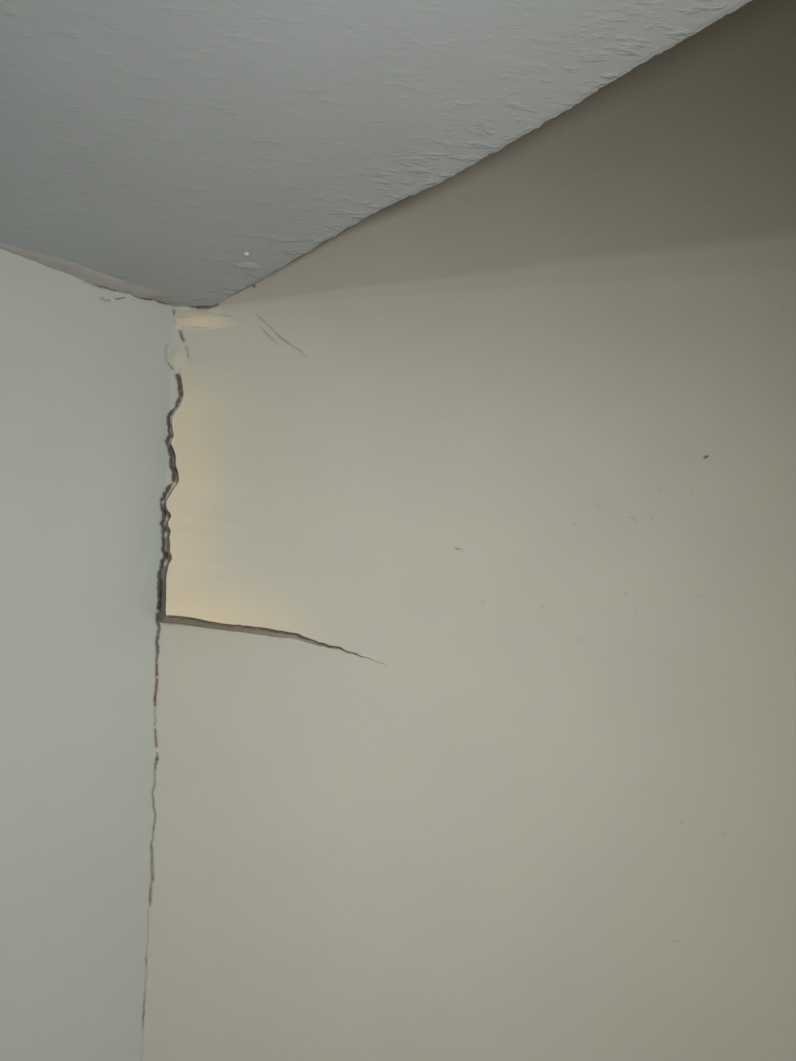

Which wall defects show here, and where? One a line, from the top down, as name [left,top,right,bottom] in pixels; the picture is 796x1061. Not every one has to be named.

crack [154,363,183,706]